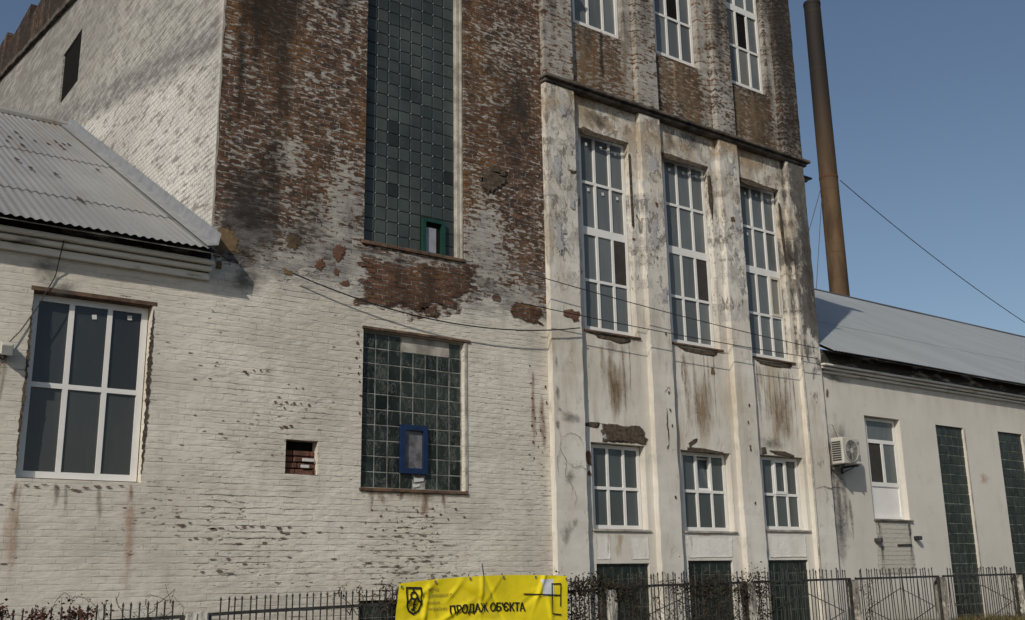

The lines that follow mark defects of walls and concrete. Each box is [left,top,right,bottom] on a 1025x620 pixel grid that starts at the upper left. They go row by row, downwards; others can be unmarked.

flaking render [314,244,482,317]
flaking render [492,293,544,326]
spalling [585,422,648,445]